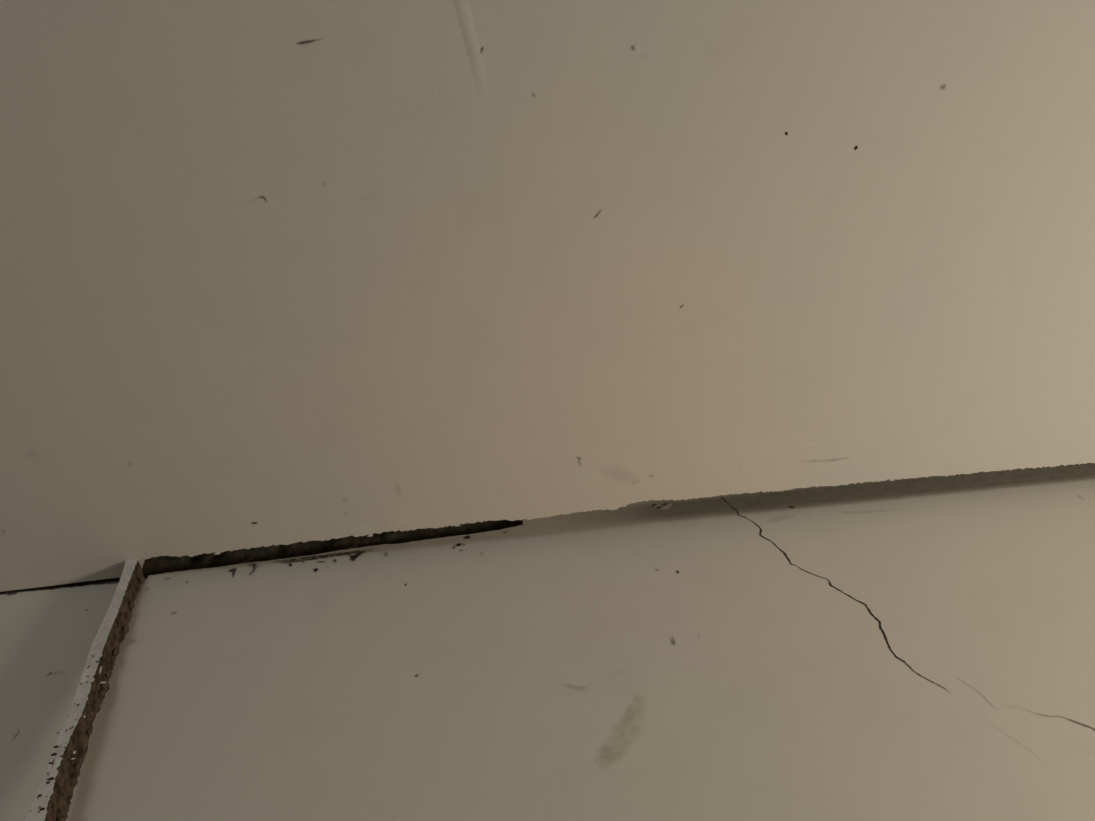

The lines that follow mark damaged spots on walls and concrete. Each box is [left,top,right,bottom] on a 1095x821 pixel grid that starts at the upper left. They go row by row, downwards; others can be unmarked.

crack [722,497,942,687]